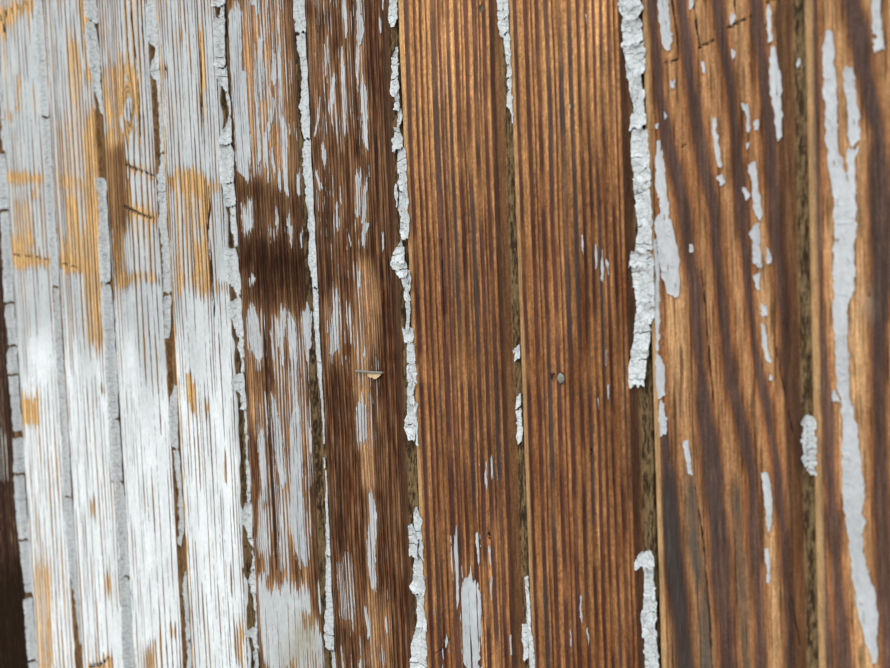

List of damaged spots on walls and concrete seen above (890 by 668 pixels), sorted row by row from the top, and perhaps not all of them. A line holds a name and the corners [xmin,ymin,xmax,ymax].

peeling [497,0,514,123]
peeling [766,4,783,141]
peeling [381,47,419,446]
peeling [617,0,680,437]
peeling [742,161,772,291]
peeling [0,0,388,668]
peeling [822,29,879,663]
peeling [761,472,773,532]
peeling [408,507,435,668]
peeling [450,526,493,668]
peeling [509,576,535,668]
peeling [634,550,659,668]